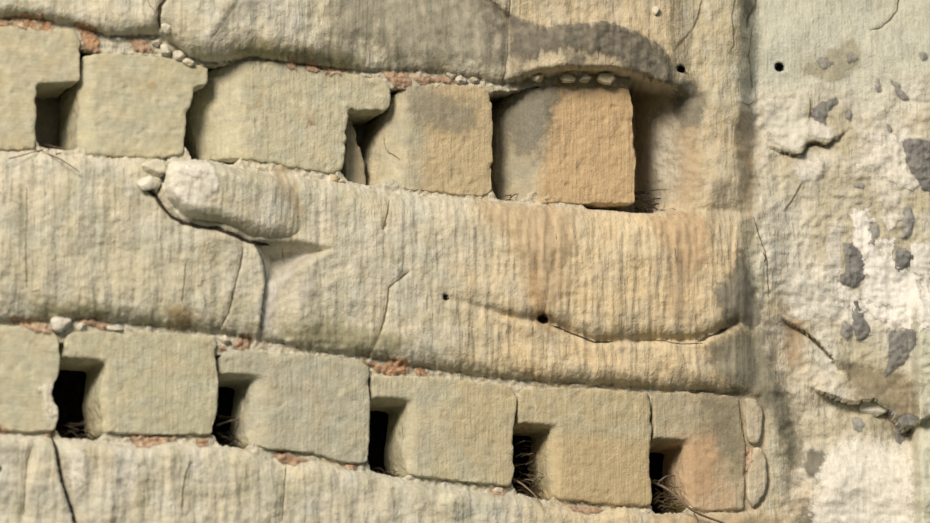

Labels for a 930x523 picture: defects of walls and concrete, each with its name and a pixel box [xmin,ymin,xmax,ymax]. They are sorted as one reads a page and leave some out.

crack [148,0,166,28]
crack [870,0,899,30]
damp [289,0,706,132]
spalling [803,40,859,81]
peeling [759,96,834,152]
crack [149,158,285,328]
peeling [781,140,930,332]
crack [368,271,409,355]
crack [543,304,613,343]
crack [640,327,729,344]
damp [701,248,824,482]
crack [51,436,75,523]